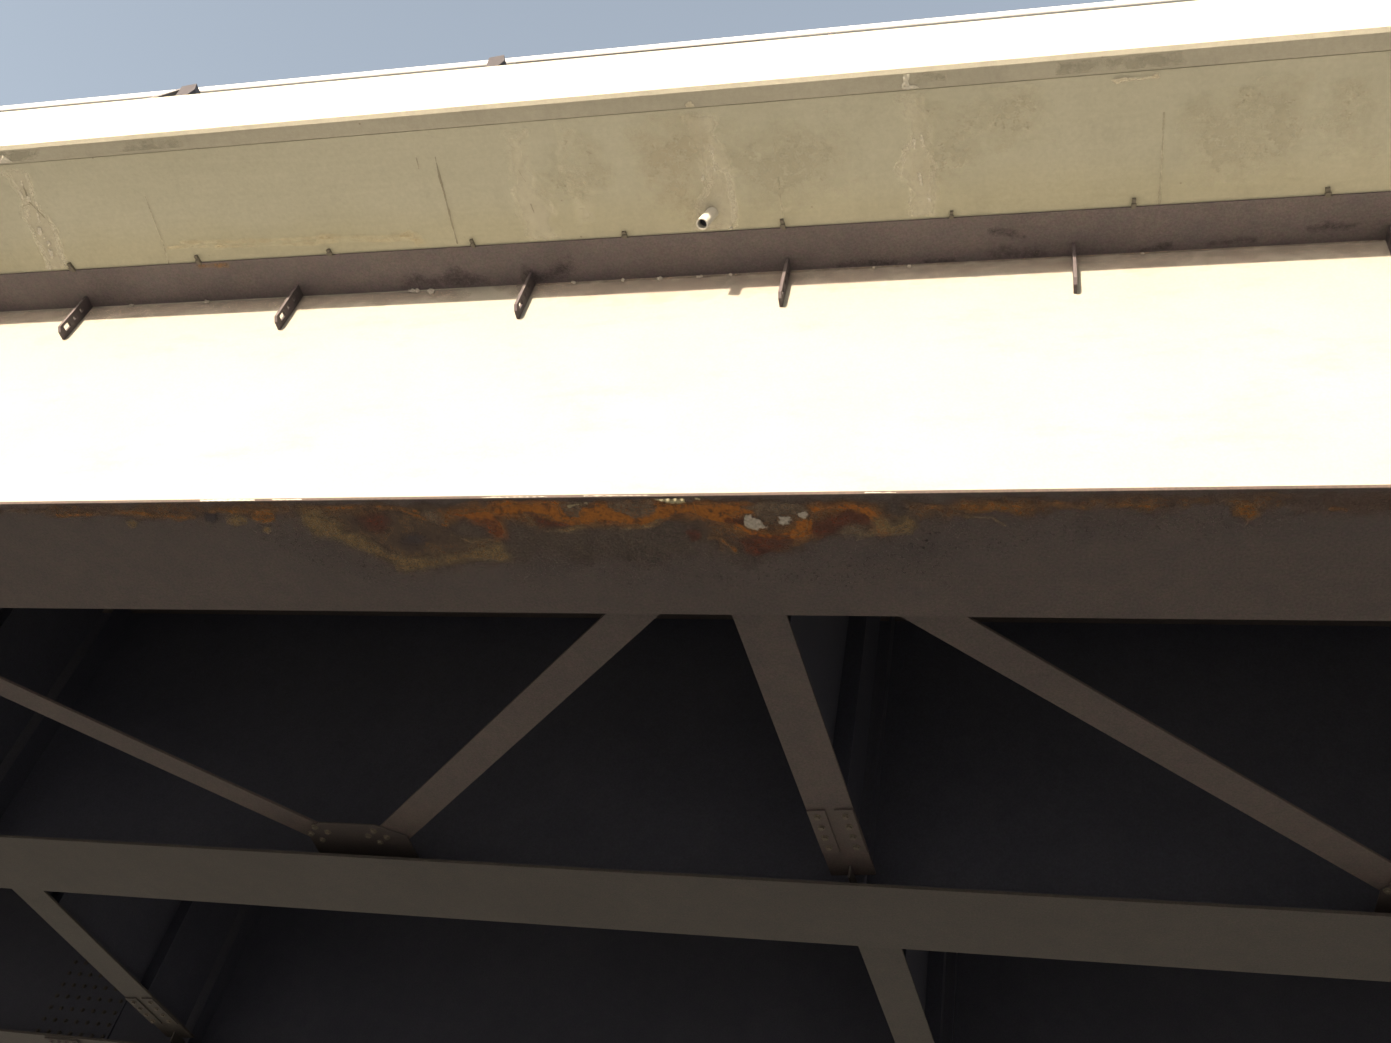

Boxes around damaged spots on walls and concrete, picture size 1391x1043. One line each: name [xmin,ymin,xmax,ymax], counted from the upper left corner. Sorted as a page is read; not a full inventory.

corrosion [9,498,918,572]
peeling [744,512,808,531]